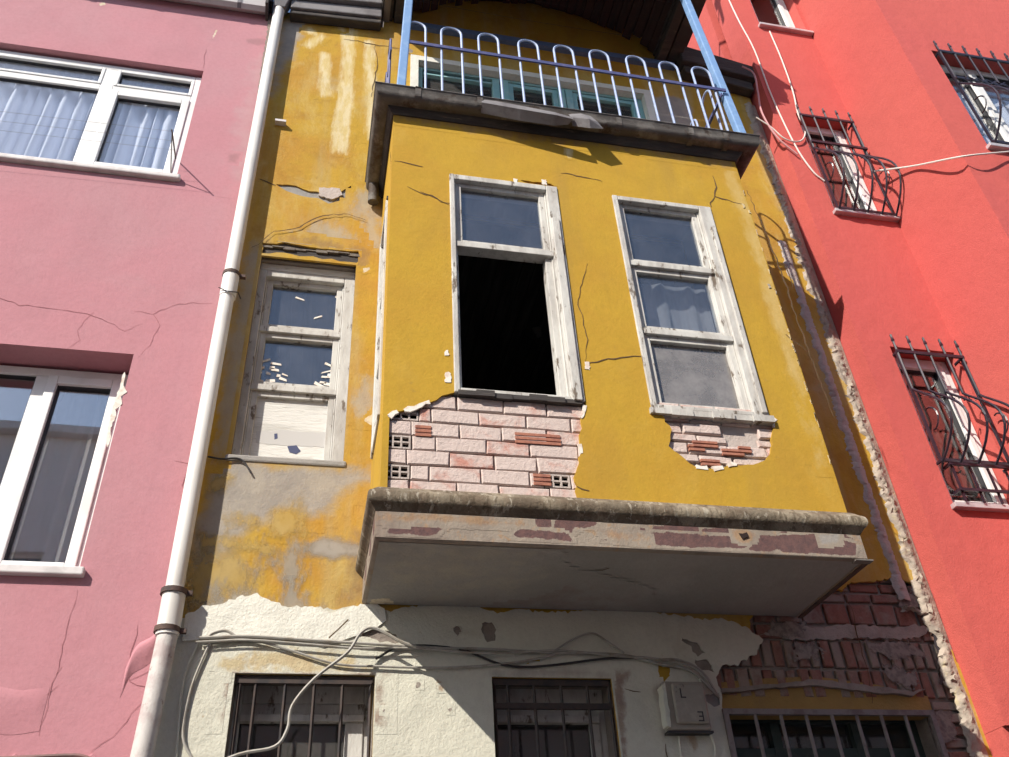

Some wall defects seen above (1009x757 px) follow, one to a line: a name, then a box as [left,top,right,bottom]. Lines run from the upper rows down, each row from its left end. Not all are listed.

crack [253,214,365,247]
crack [1,298,195,355]
crack [577,263,641,363]
flaking render [387,395,587,498]
flaking render [657,402,751,412]
flaking render [664,417,777,472]
flaking render [682,102,989,757]
peeling [364,516,452,584]
peeling [507,519,613,544]
peeling [628,524,860,558]
crack [18,589,78,732]
crack [91,624,149,752]